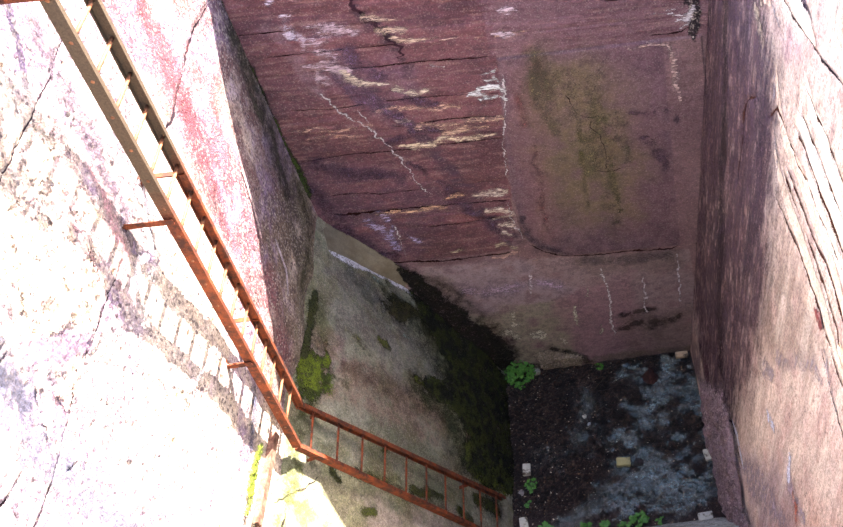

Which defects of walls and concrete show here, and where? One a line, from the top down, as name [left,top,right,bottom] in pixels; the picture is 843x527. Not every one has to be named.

corrosion [140,0,229,240]
crack [275,476,319,527]
water stain [329,251,502,523]